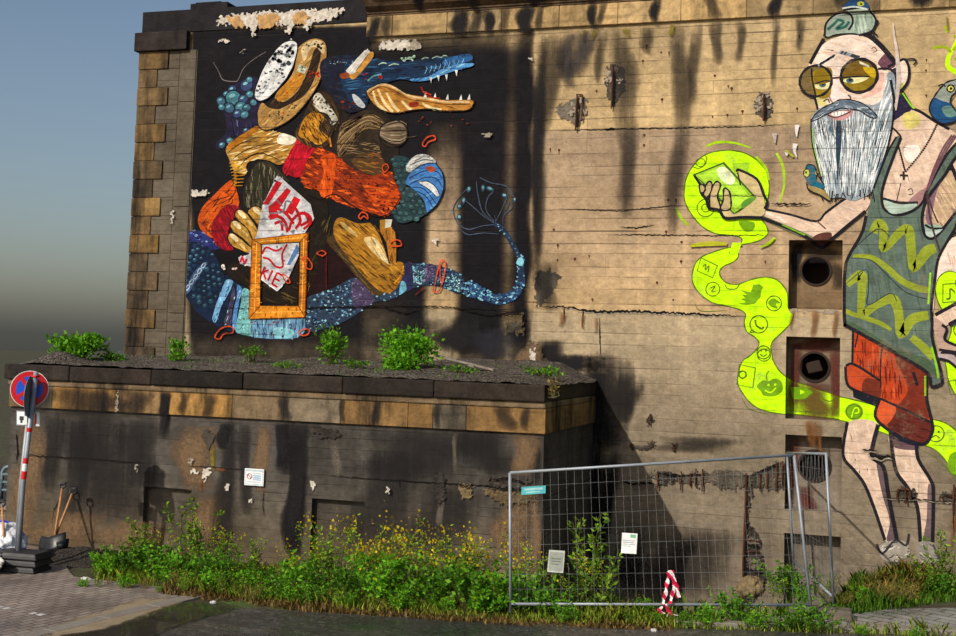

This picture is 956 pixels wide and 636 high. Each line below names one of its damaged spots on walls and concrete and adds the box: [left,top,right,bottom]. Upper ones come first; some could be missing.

peeling [216,7,345,37]
water stain [737,23,745,55]
water stain [767,0,782,75]
water stain [372,316,511,356]
crack [306,304,737,370]
water stain [174,400,308,554]
water stain [353,407,540,549]
water stain [517,340,638,590]
water stain [662,437,728,451]
water stain [492,502,541,568]
water stain [616,533,718,591]
spalling [615,461,785,586]